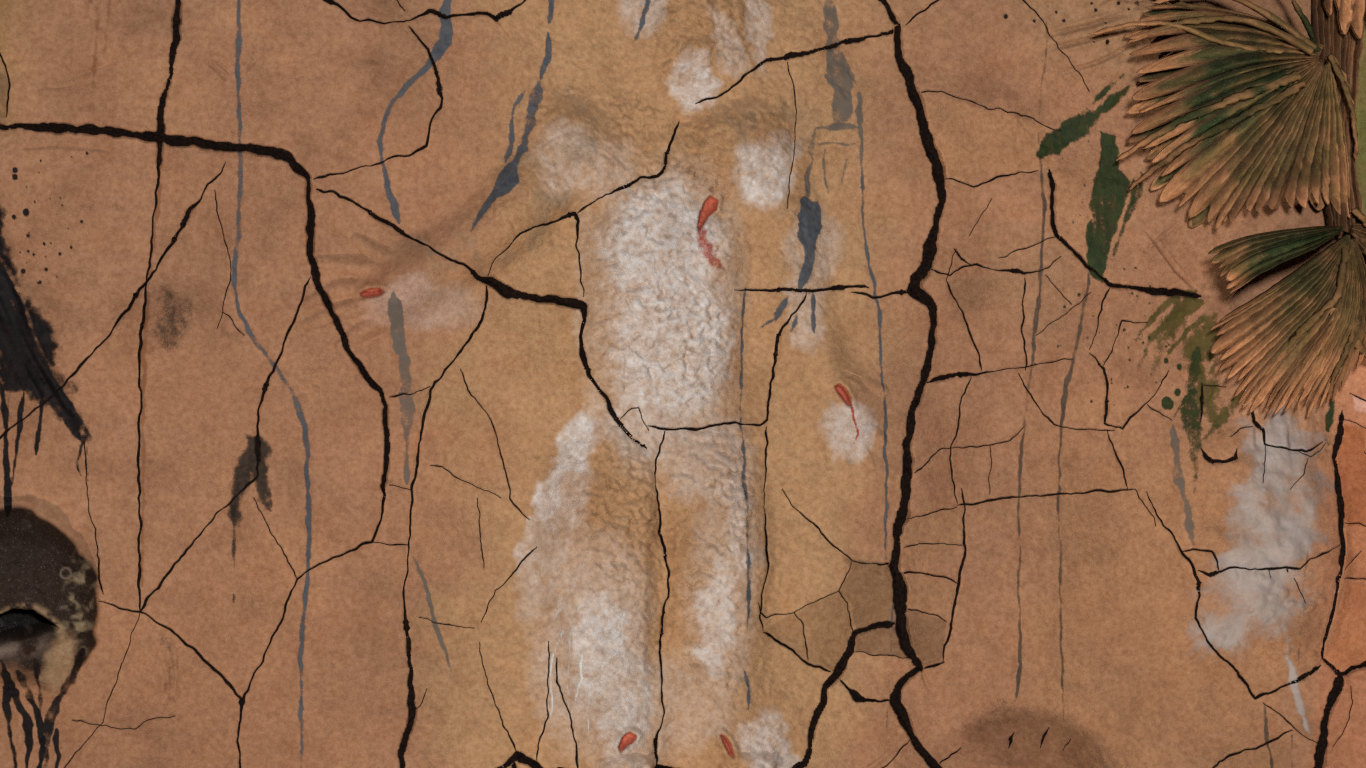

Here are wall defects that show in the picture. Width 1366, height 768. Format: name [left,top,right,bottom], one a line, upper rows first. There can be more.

damp [377,0,453,224]
damp [472,0,554,230]
damp [0,382,44,517]
damp [60,413,88,481]
crack [0,0,869,768]
crack [695,0,1366,768]
damp [1170,351,1226,545]
damp [1204,408,1313,646]
damp [1287,657,1308,738]